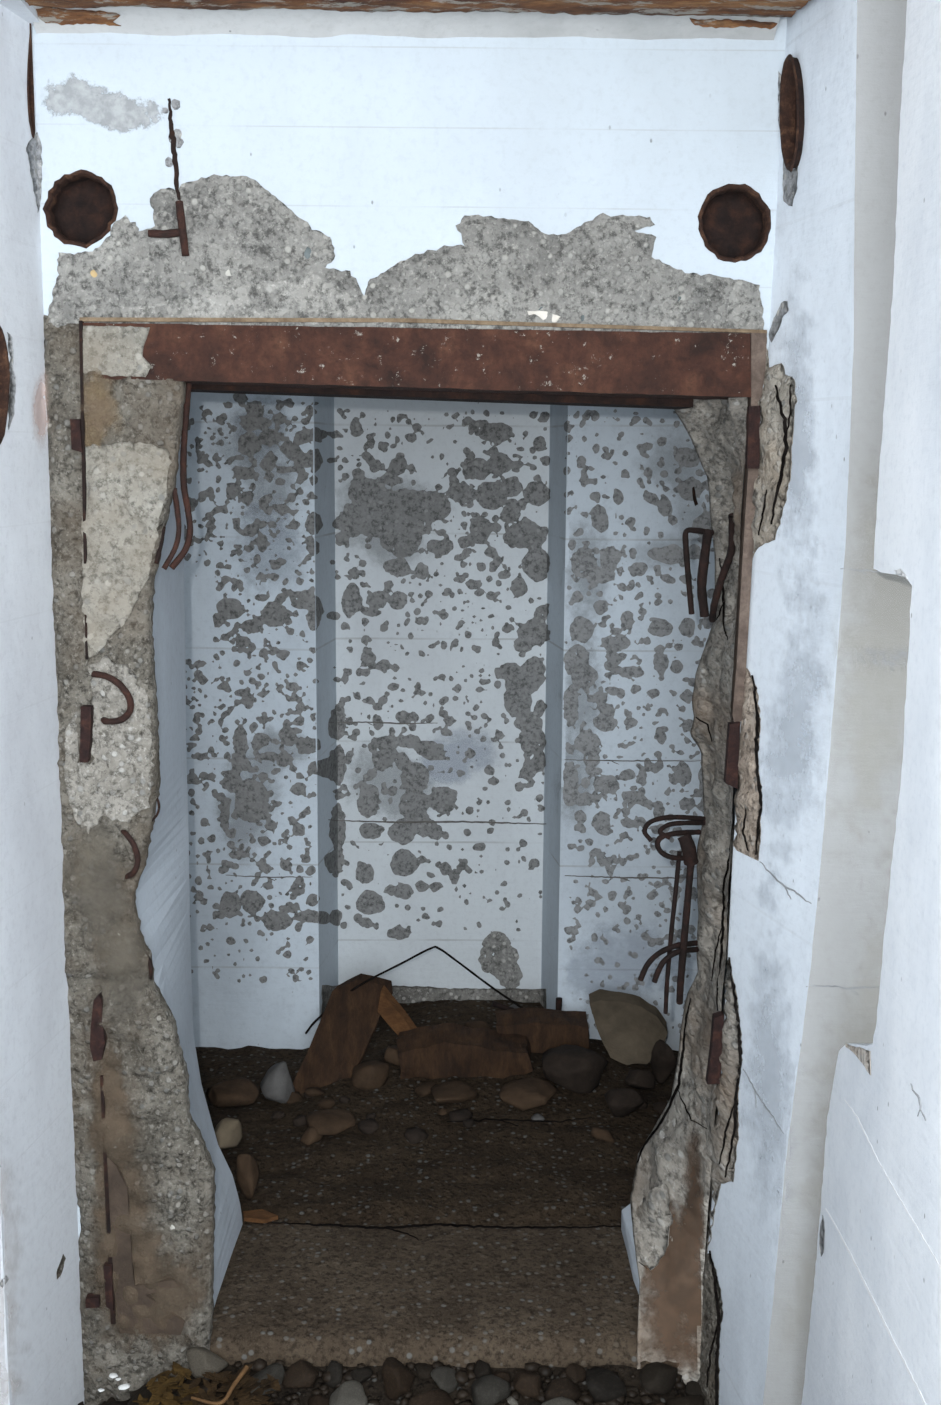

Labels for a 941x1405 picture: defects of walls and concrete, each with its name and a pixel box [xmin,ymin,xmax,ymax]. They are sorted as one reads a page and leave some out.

spalling [43,174,797,1405]
rust [677,834,699,866]